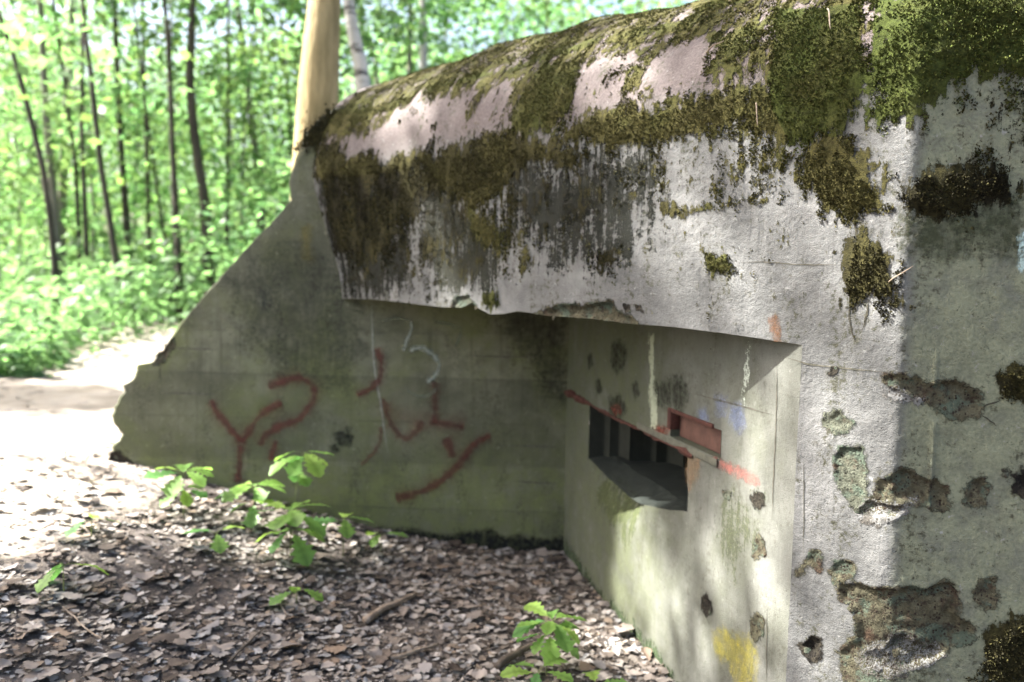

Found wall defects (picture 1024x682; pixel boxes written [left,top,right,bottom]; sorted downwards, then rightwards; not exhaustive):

damp [313,126,671,301]
spalling [534,298,644,325]
spalling [152,336,176,366]
spalling [880,372,985,422]
spalling [107,450,135,465]
spalling [821,408,1024,529]
spalling [749,491,765,510]
damp [395,528,564,552]
spalling [751,533,767,561]
spalling [701,593,713,617]
spalling [750,612,765,642]
spalling [794,549,1002,682]